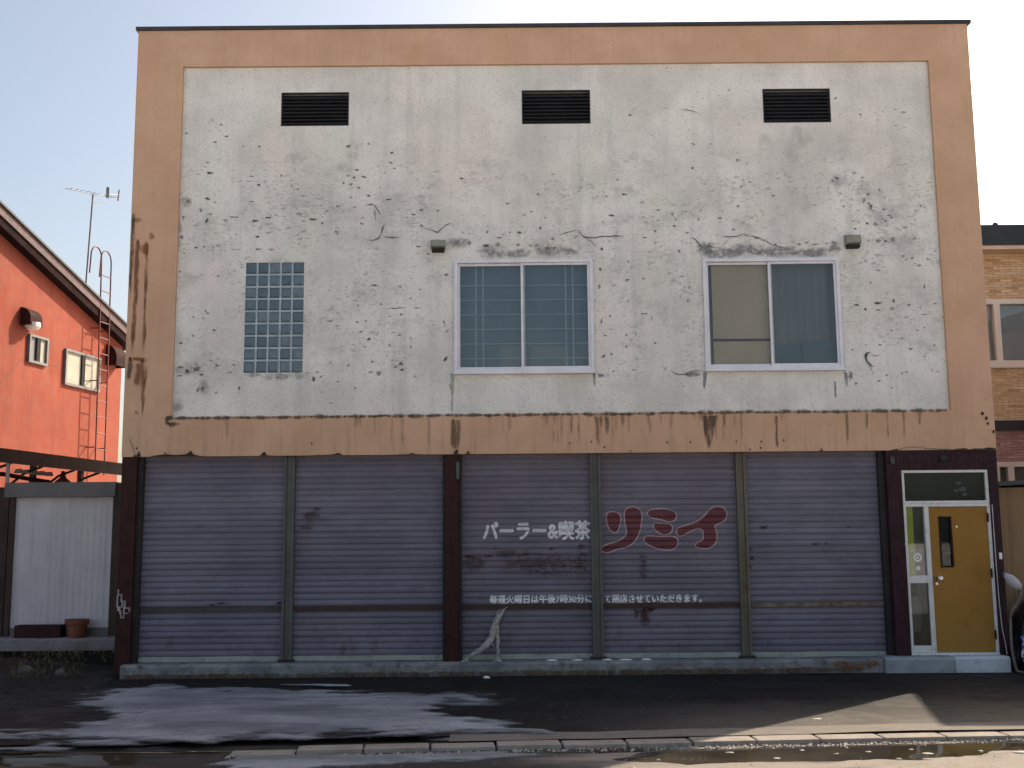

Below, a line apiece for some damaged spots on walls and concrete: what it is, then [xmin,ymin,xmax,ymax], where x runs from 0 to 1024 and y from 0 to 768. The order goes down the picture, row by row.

crack [367,204,398,241]
crack [560,230,619,246]
crack [693,233,785,248]
water stain [699,243,840,258]
corrosion [131,235,153,344]
corrosion [133,358,147,414]